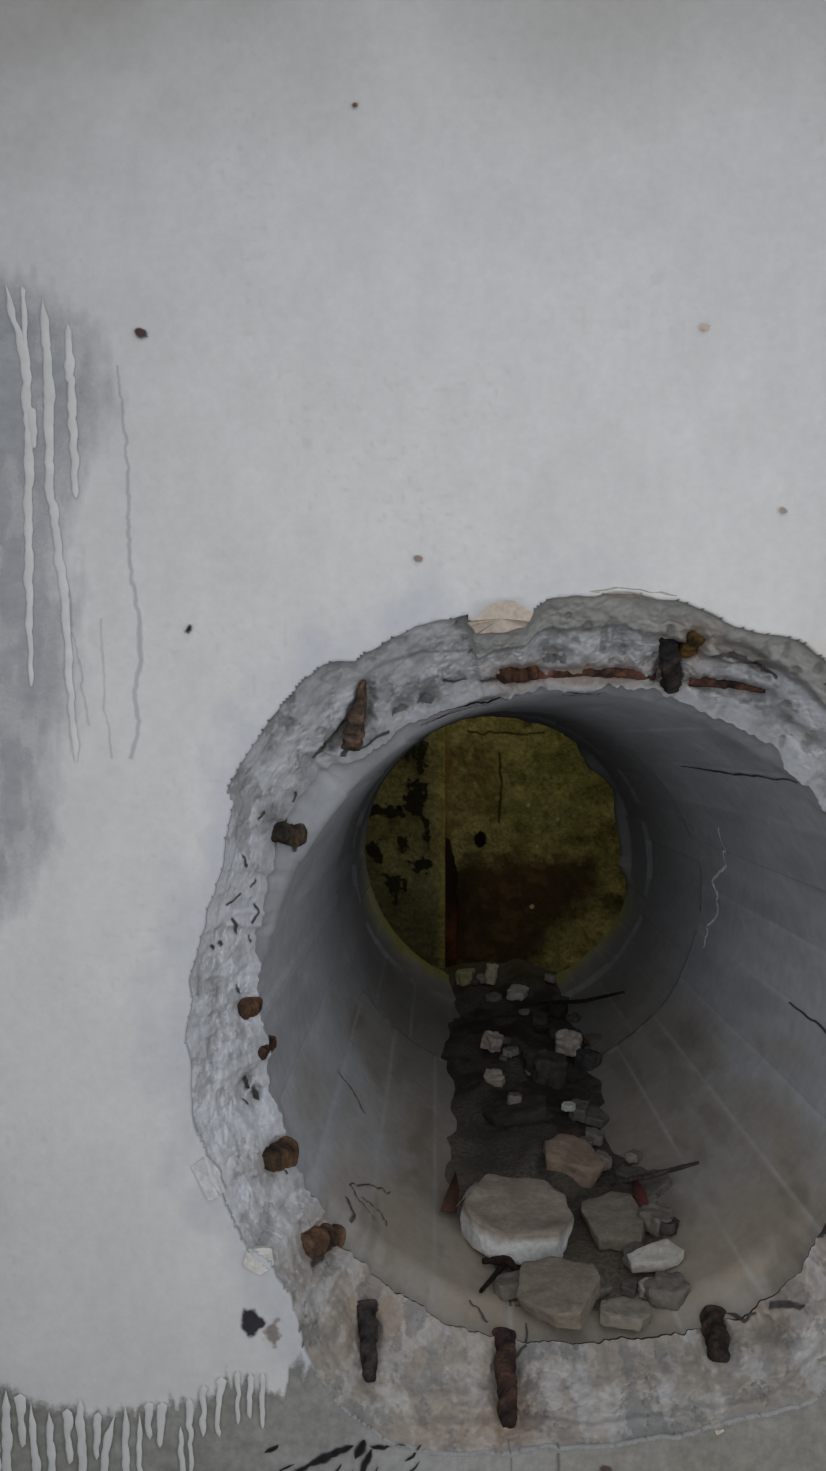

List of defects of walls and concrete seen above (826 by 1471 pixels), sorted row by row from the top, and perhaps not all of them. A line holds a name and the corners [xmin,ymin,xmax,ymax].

water stain [5,282,79,763]
spalling [0,587,826,1471]
water stain [0,1371,265,1471]